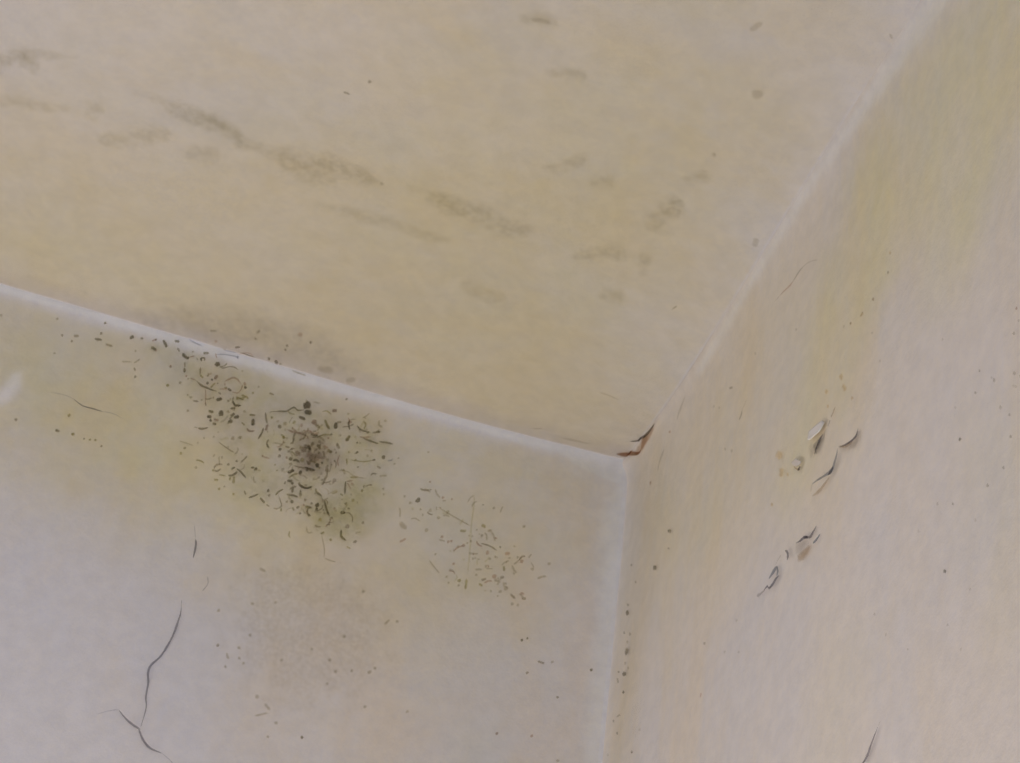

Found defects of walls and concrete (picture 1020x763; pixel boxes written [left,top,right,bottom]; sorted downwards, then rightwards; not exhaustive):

leakage [199,379,281,450]
leakage [249,457,329,516]